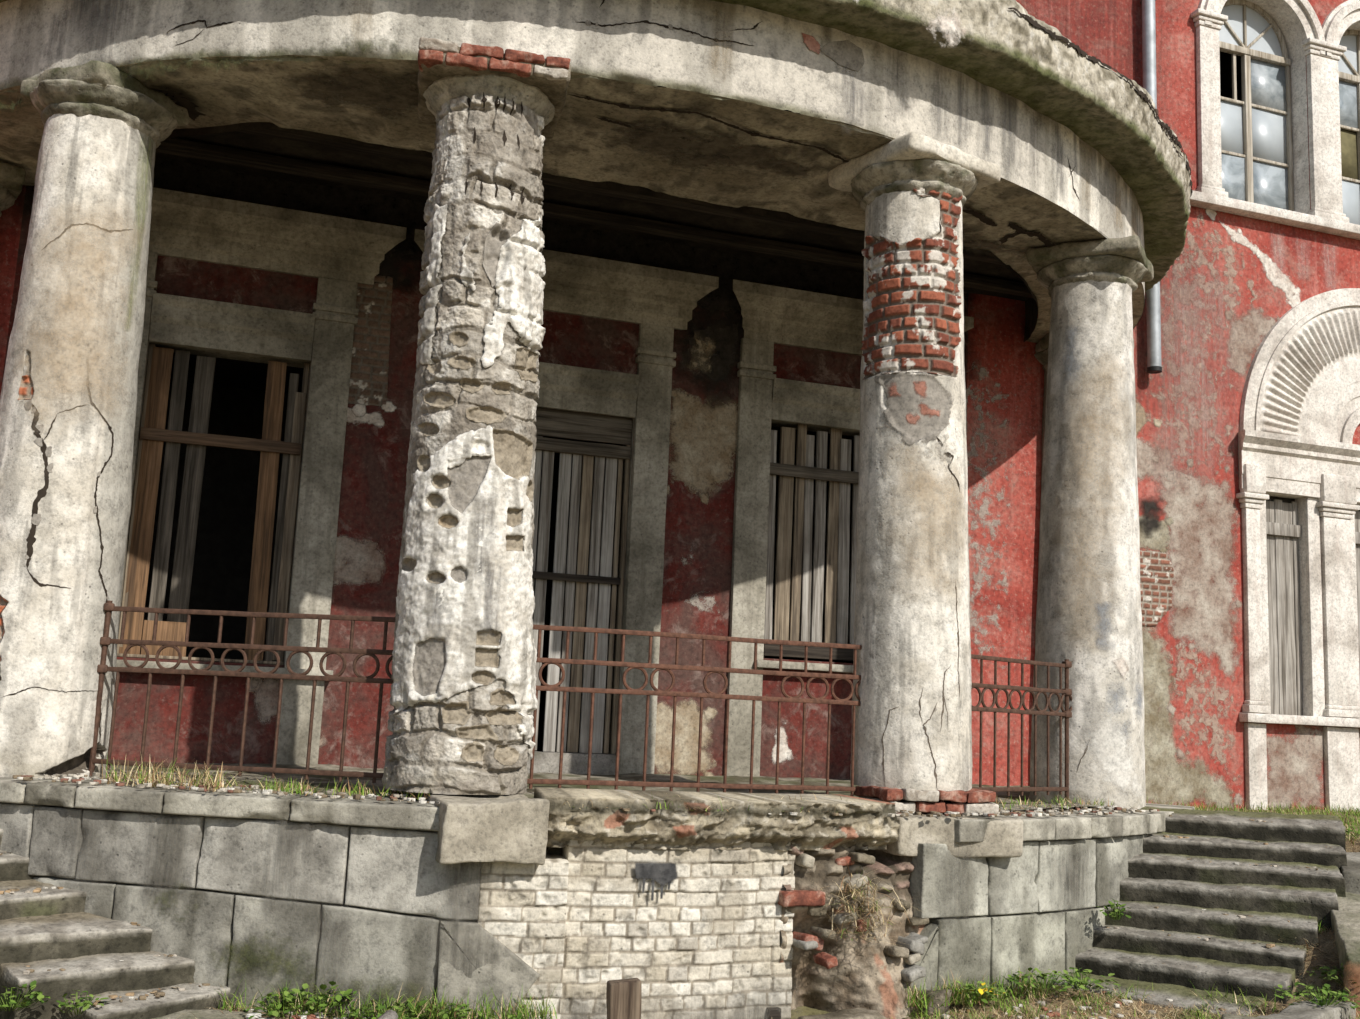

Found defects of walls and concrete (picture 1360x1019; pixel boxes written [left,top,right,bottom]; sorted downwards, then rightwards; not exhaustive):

crack [168,20,232,47]
crack [579,0,761,46]
crack [42,223,133,250]
crack [962,210,1055,247]
flaking render [346,275,396,426]
crack [24,385,114,603]
flaking render [392,204,546,766]
peeling [667,389,738,504]
flaking render [861,188,1013,661]
peeling [1090,209,1300,808]
flaking render [0,595,9,662]
crack [0,663,102,744]